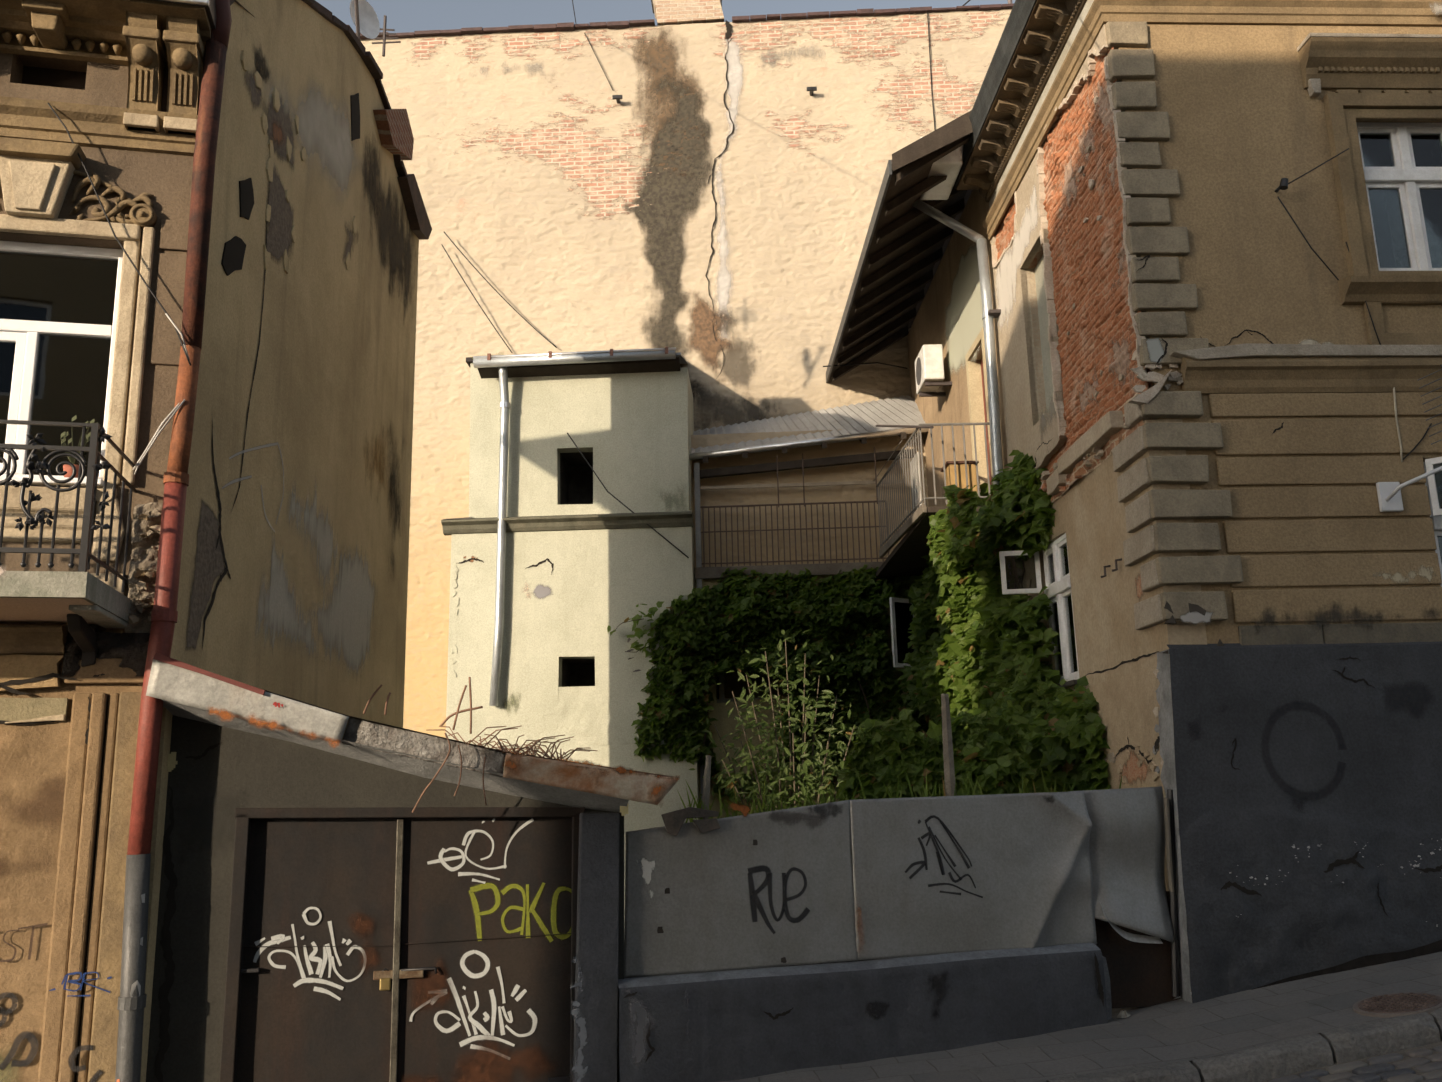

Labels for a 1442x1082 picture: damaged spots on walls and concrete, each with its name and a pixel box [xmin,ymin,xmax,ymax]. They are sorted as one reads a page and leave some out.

leakage [625,31,769,426]
crack [705,20,734,379]
spalling [1036,45,1183,503]
crack [0,673,91,746]
corrosion [209,707,283,729]
corrosion [554,757,679,798]